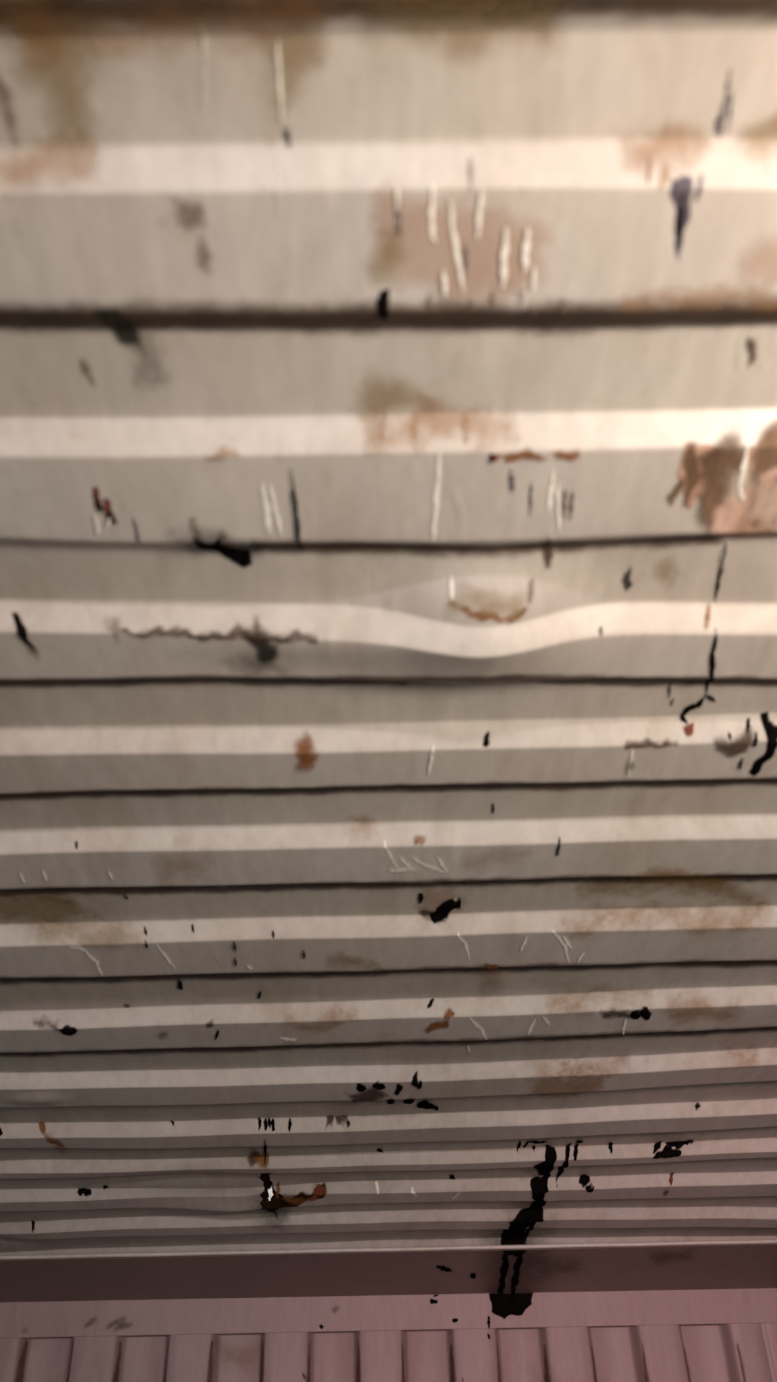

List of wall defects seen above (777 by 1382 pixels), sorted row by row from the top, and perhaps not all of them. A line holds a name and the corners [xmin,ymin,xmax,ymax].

corrosion [449,575,527,622]
crack [680,543,727,736]
corrosion [0,737,777,800]